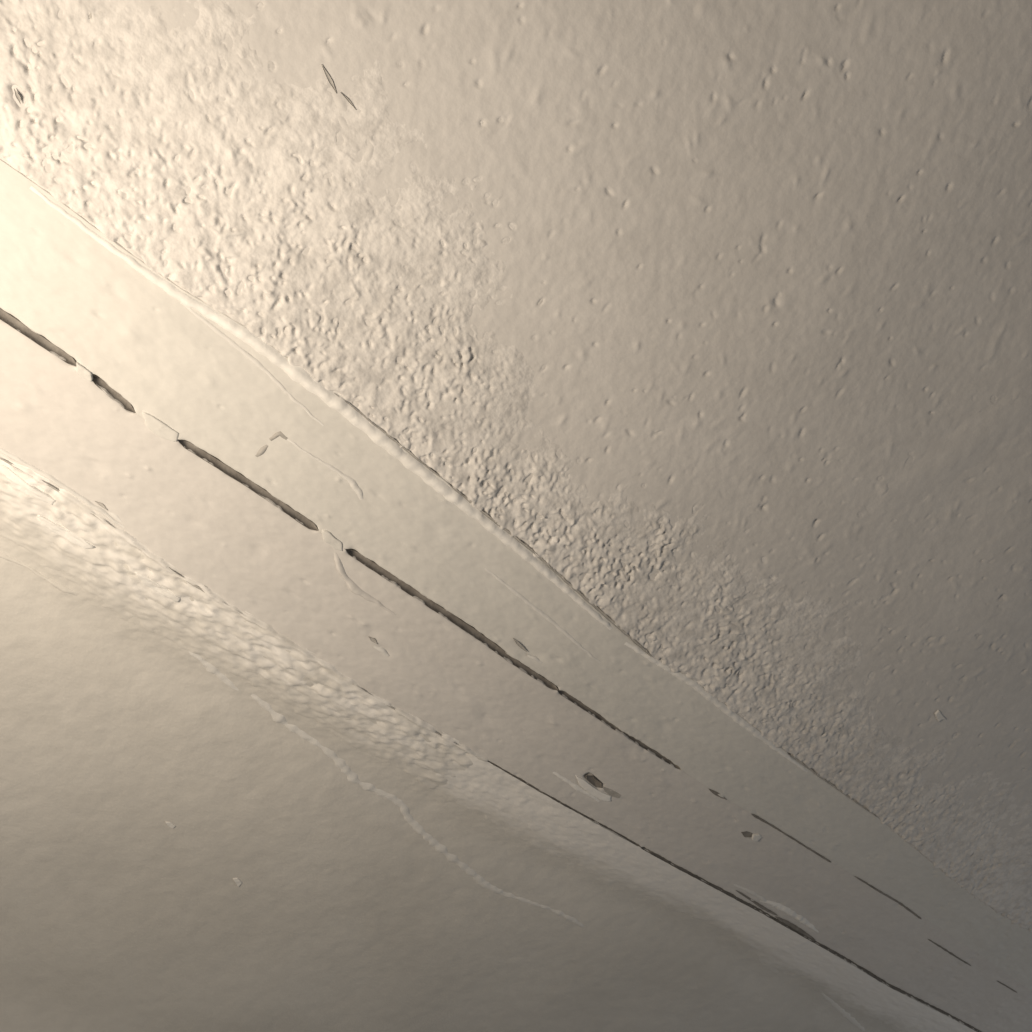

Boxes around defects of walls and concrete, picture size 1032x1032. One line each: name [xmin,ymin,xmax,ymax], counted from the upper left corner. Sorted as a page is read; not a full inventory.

crack [0,308,136,413]
crack [0,457,59,492]
crack [178,440,318,531]
crack [334,393,652,657]
crack [347,549,681,770]
crack [189,651,584,927]
peeling [553,772,621,802]
crack [488,754,981,1032]
peeling [734,884,819,940]